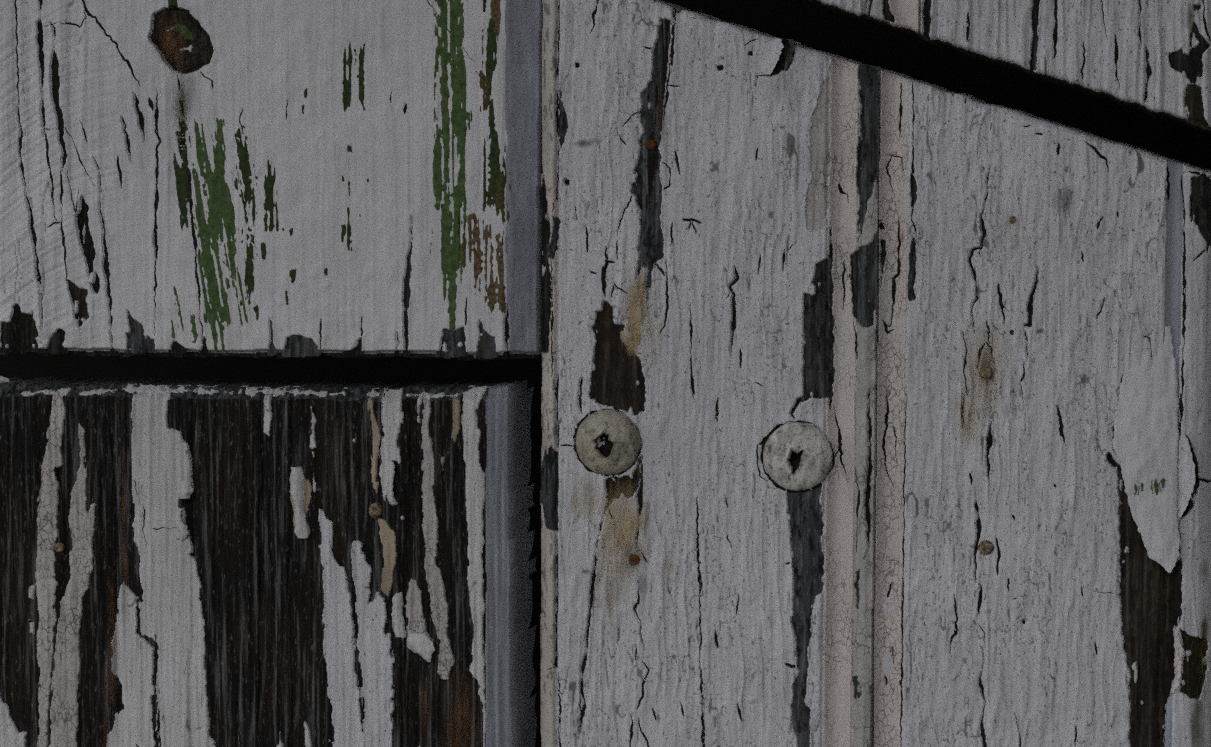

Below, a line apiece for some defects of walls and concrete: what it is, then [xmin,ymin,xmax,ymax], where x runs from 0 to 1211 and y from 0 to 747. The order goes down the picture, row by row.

crack [14,0,213,355]
peeling [151,0,214,74]
peeling [125,99,321,357]
peeling [430,0,511,359]
peeling [589,301,646,415]
peeling [1169,5,1211,130]
peeling [0,394,97,747]
peeling [106,385,216,747]
peeling [289,388,454,747]
peeling [451,386,487,747]
peeling [787,483,824,747]
peeling [1112,326,1208,747]